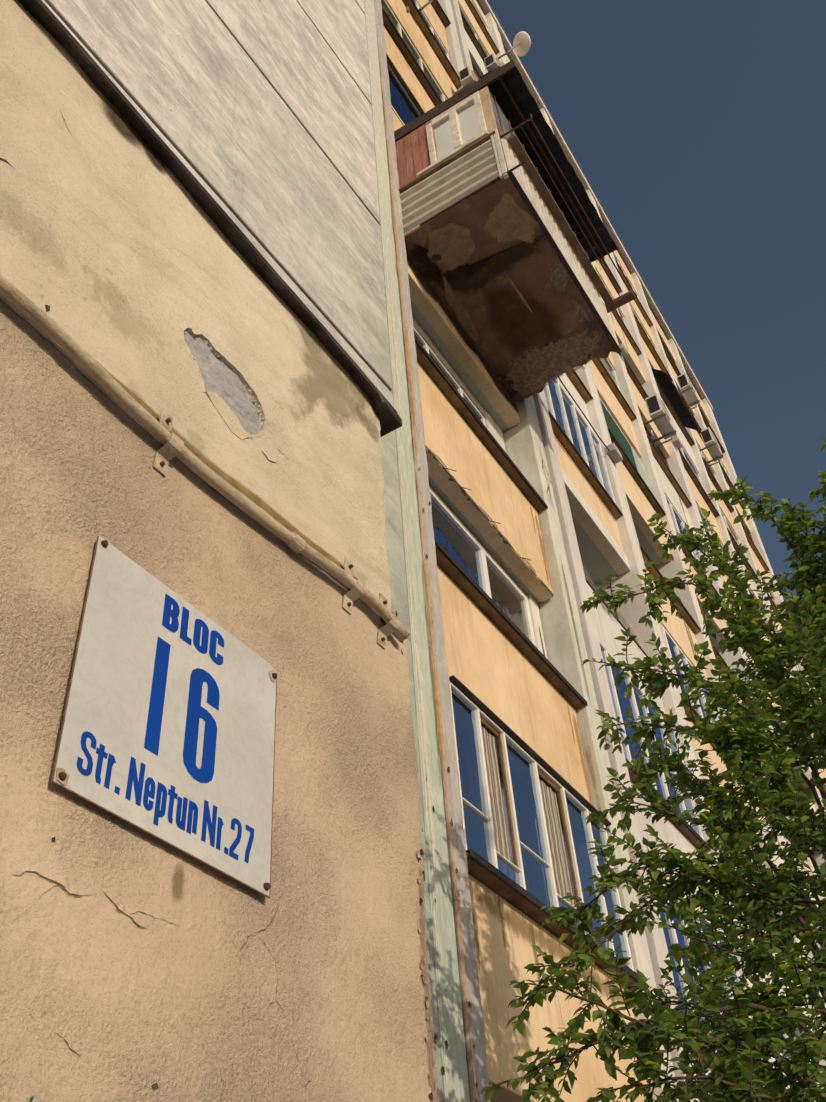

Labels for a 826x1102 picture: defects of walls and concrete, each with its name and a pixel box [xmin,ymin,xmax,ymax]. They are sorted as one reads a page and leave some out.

water stain [413,237,539,291]
peeling [427,191,538,343]
spalling [179,324,267,441]
spalling [505,328,601,397]
crack [9,863,179,930]